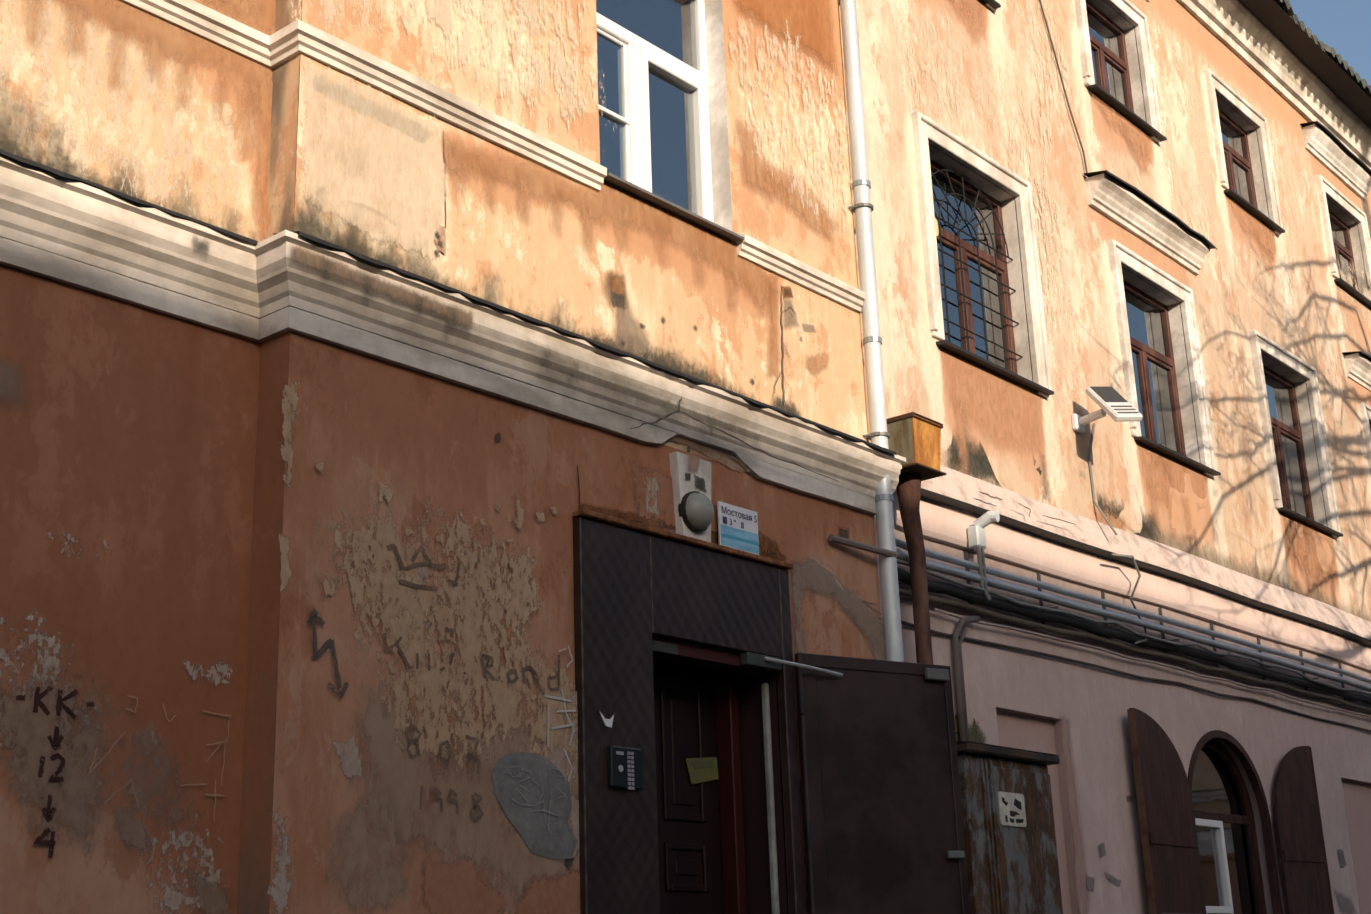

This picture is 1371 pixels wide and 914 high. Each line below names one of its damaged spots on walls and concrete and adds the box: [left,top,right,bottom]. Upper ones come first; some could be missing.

leakage [0,125,136,198]
leakage [62,0,276,239]
peeling [320,0,596,128]
leakage [194,238,209,250]
leakage [291,211,473,328]
leakage [592,274,732,391]
flaking render [280,380,300,488]
leakage [773,397,799,416]
flaking render [278,535,292,591]
peeling [316,485,581,914]
peeling [0,612,232,914]
flaking render [268,811,294,914]